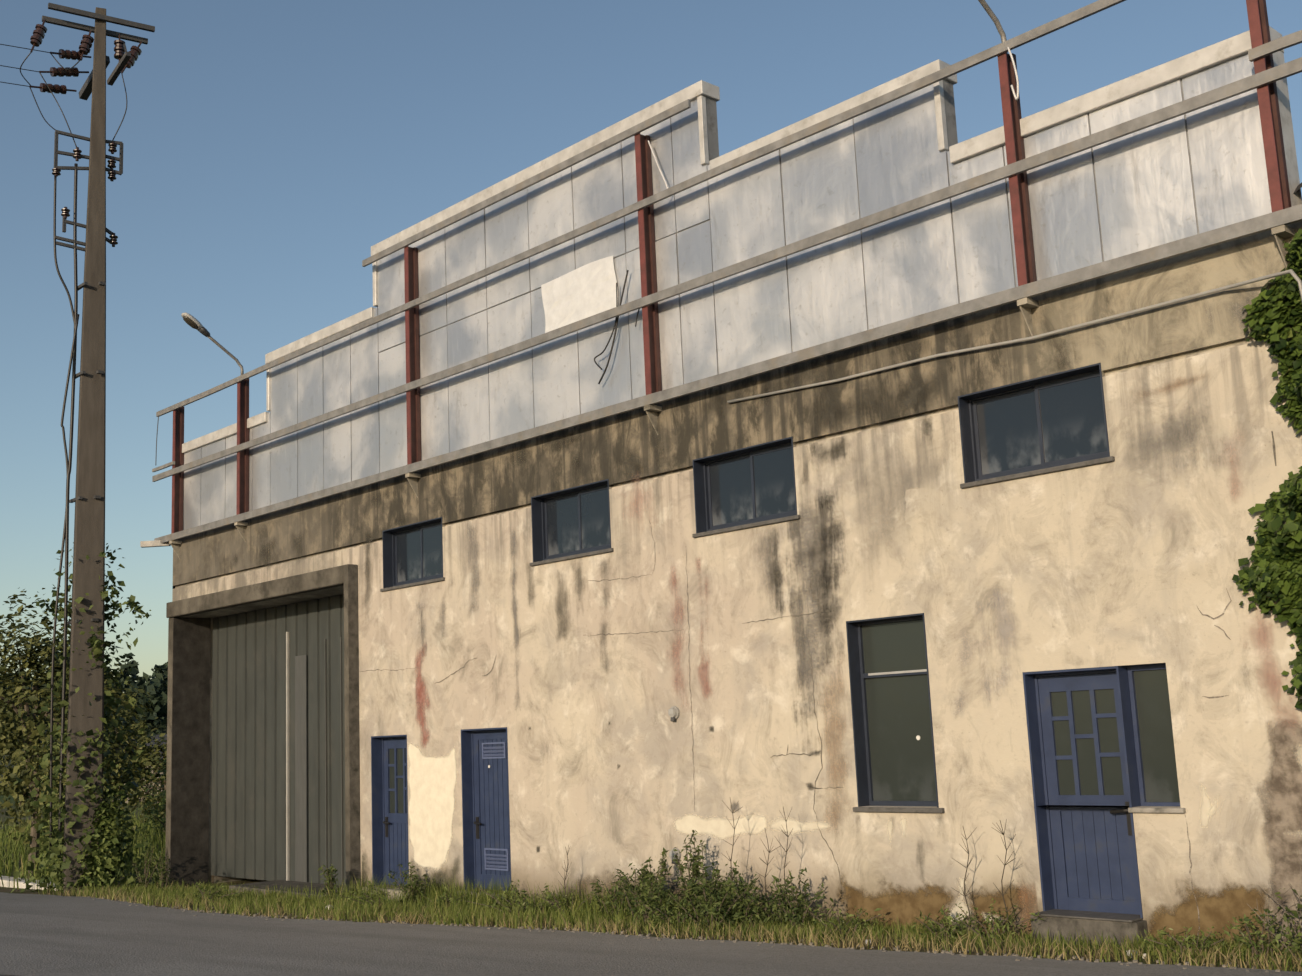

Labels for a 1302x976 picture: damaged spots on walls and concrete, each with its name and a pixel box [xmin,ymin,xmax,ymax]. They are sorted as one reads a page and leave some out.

damp [820,439,845,459]
damp [766,538,780,594]
damp [793,498,832,678]
crack [747,611,830,623]
corrosion [416,650,429,745]
crack [772,653,843,898]
damp [839,882,954,931]
damp [970,886,1022,938]